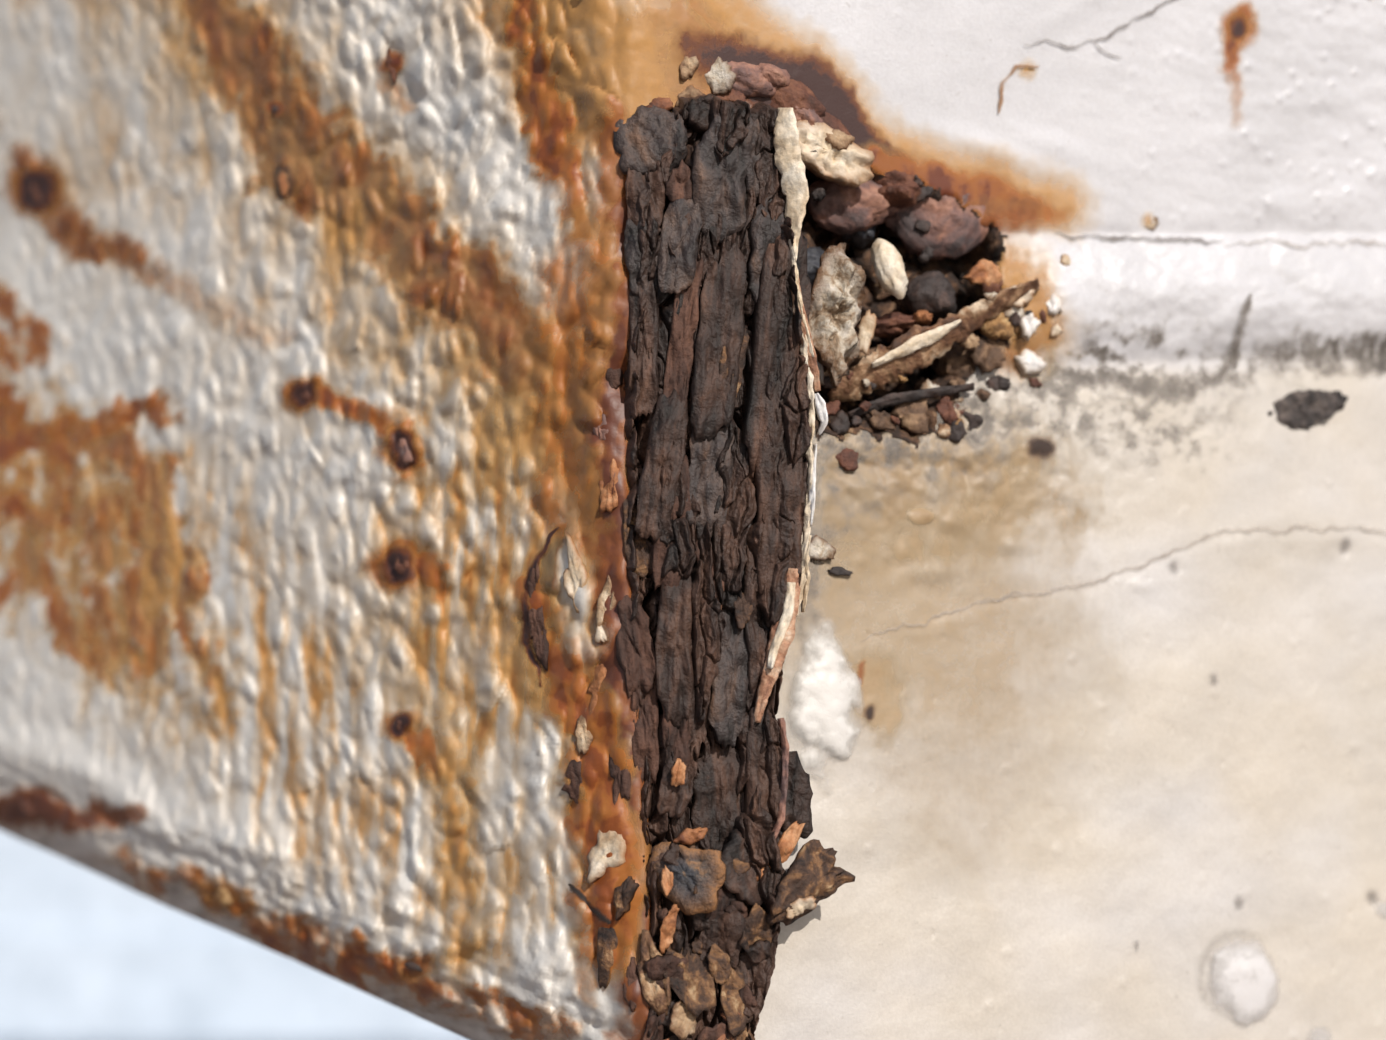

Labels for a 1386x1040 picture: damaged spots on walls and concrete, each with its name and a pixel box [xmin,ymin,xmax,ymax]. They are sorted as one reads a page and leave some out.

crack [998,0,1172,113]
rust [1223,4,1256,80]
rust [8,144,171,292]
spalling [1060,254,1071,266]
water stain [1029,364,1240,400]
water stain [1261,332,1386,375]
spalling [646,56,1063,838]
rust [0,285,238,742]
rust [115,0,1080,1040]
water stain [795,416,1085,734]
rust [0,786,146,835]